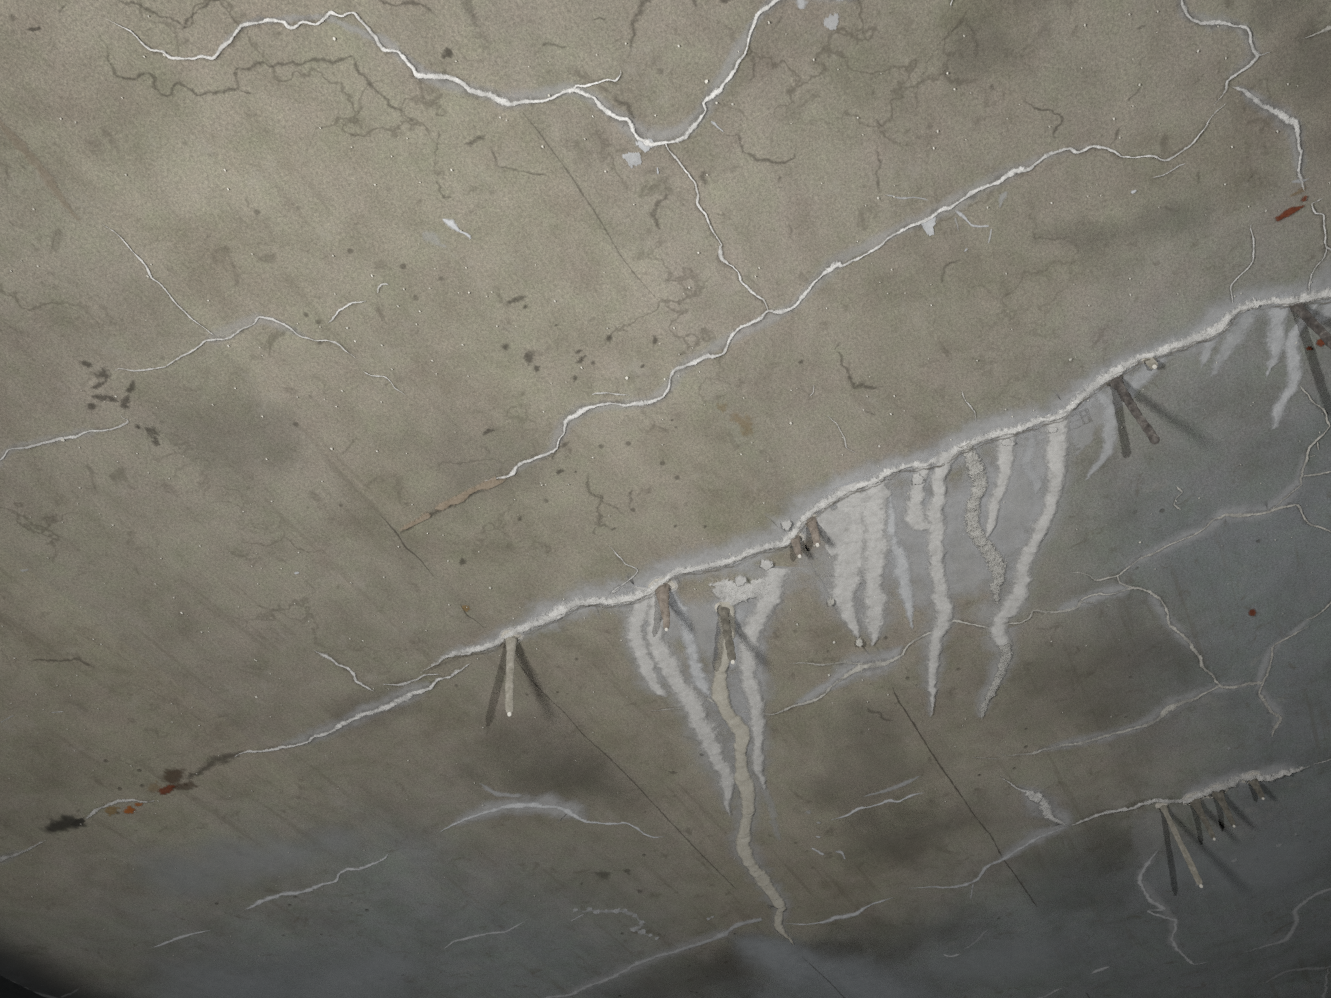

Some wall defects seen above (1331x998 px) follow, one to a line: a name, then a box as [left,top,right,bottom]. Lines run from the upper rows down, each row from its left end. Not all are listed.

crack [1306,26,1331,38]
rust [1276,196,1307,221]
crack [107,0,1309,530]
crack [0,227,405,460]
crack [190,199,1331,998]
crack [86,799,152,819]
crack [0,842,42,861]
crack [152,930,210,948]